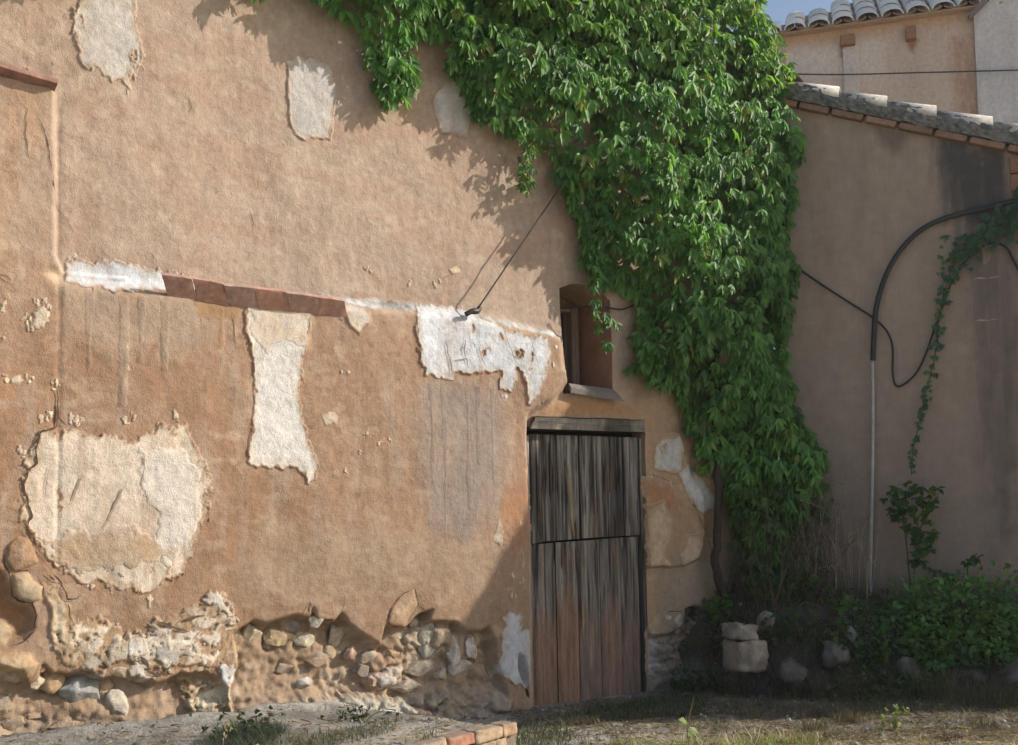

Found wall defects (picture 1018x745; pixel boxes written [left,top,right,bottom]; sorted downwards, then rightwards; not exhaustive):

crack [15,91,88,238]
peeling [70,0,146,96]
peeling [285,55,348,143]
peeling [431,74,472,140]
peeling [61,254,196,294]
peeling [242,307,321,486]
peeling [413,302,558,410]
leakage [796,109,1018,569]
crack [3,392,83,645]
peeling [0,409,532,731]
peeling [642,431,715,569]